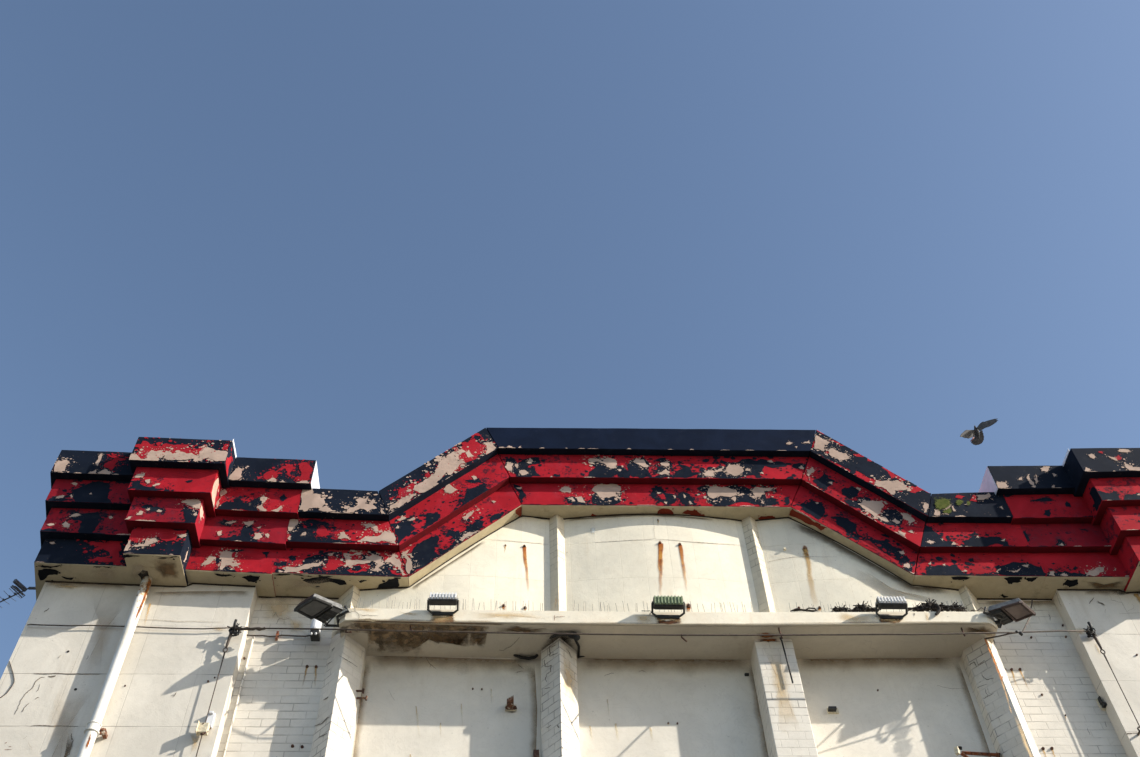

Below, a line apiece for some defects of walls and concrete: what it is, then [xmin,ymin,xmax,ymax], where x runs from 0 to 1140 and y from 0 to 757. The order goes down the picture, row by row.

peeling [36,430,1116,598]
peeling [1072,449,1140,519]
damp [352,621,538,651]